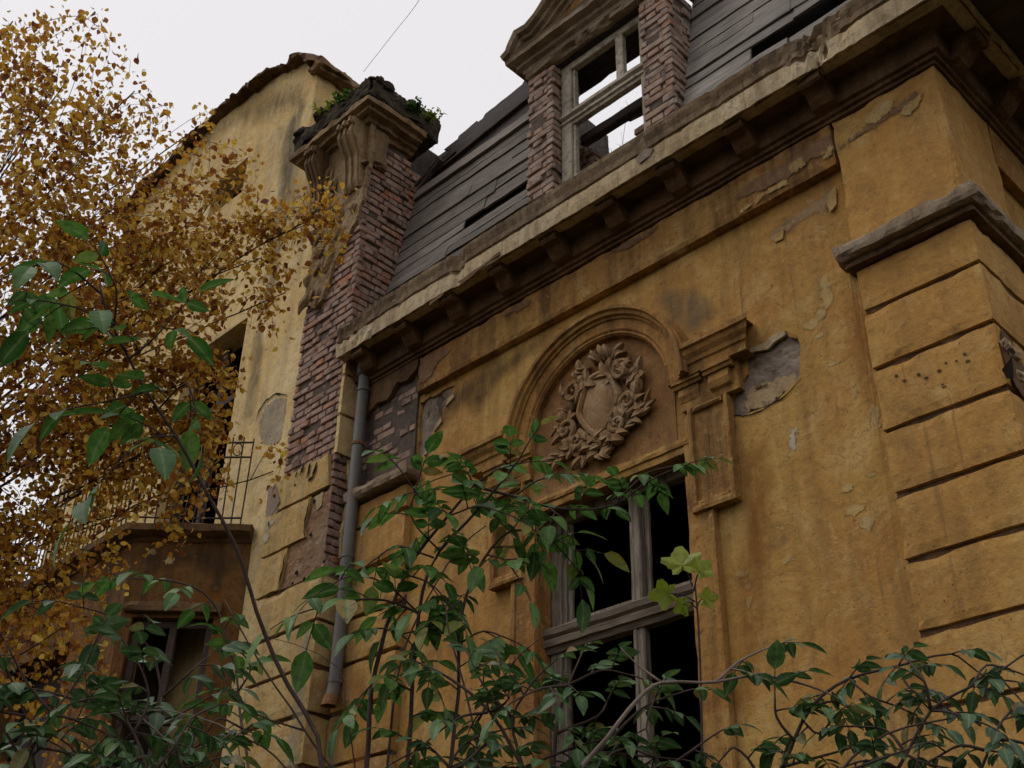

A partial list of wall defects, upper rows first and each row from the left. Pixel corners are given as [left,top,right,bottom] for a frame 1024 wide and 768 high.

peeling [770,186,839,242]
peeling [736,90,924,213]
flaking render [734,274,834,417]
flaking render [362,347,455,485]